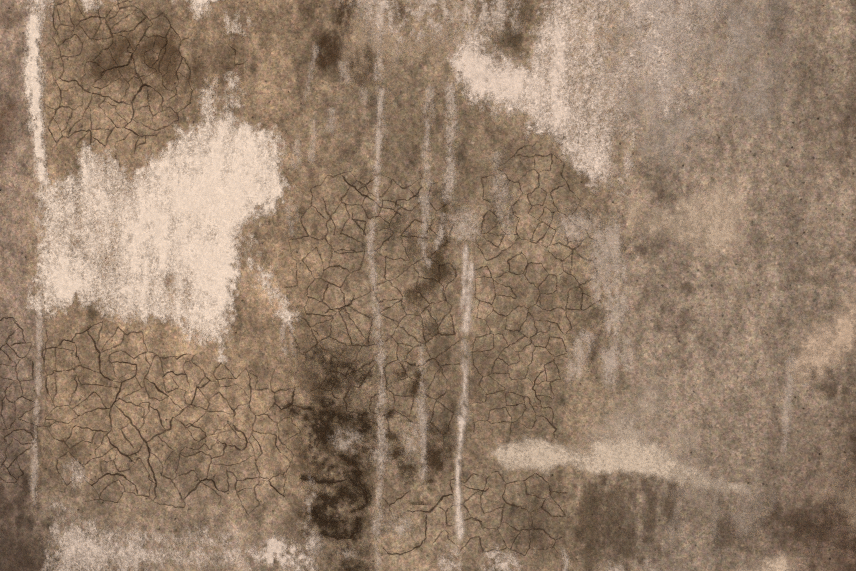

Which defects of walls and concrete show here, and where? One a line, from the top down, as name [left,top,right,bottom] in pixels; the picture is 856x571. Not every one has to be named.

leakage [24,15,47,182]
crack [48,0,193,150]
leakage [53,523,179,571]
crack [0,317,562,556]
leakage [248,398,375,571]
crack [291,171,456,447]
leakage [386,433,413,475]
leakage [401,371,421,393]
leakage [407,172,452,300]
leakage [425,366,467,539]
leakage [461,247,473,332]
crack [473,147,599,432]